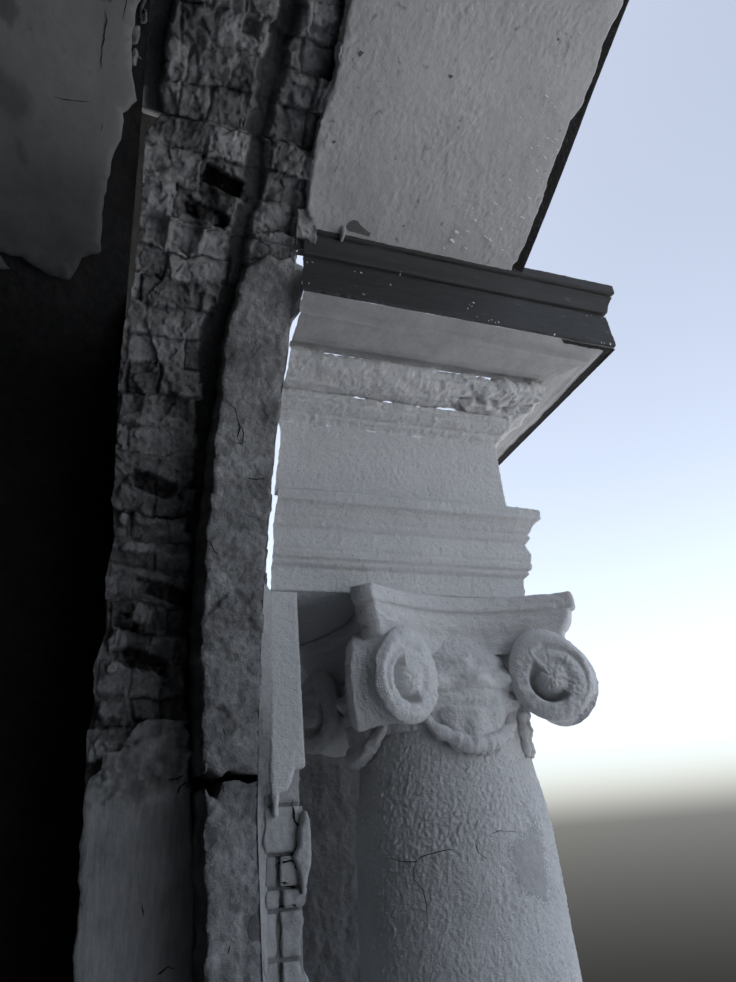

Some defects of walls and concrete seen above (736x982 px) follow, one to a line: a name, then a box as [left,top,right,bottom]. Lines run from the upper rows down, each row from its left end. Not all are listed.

flaking render [346,220,371,237]
flaking render [84,0,352,797]
flaking render [247,573,272,982]
spalling [203,827,218,852]
flaking render [292,810,312,894]
crack [388,830,515,913]